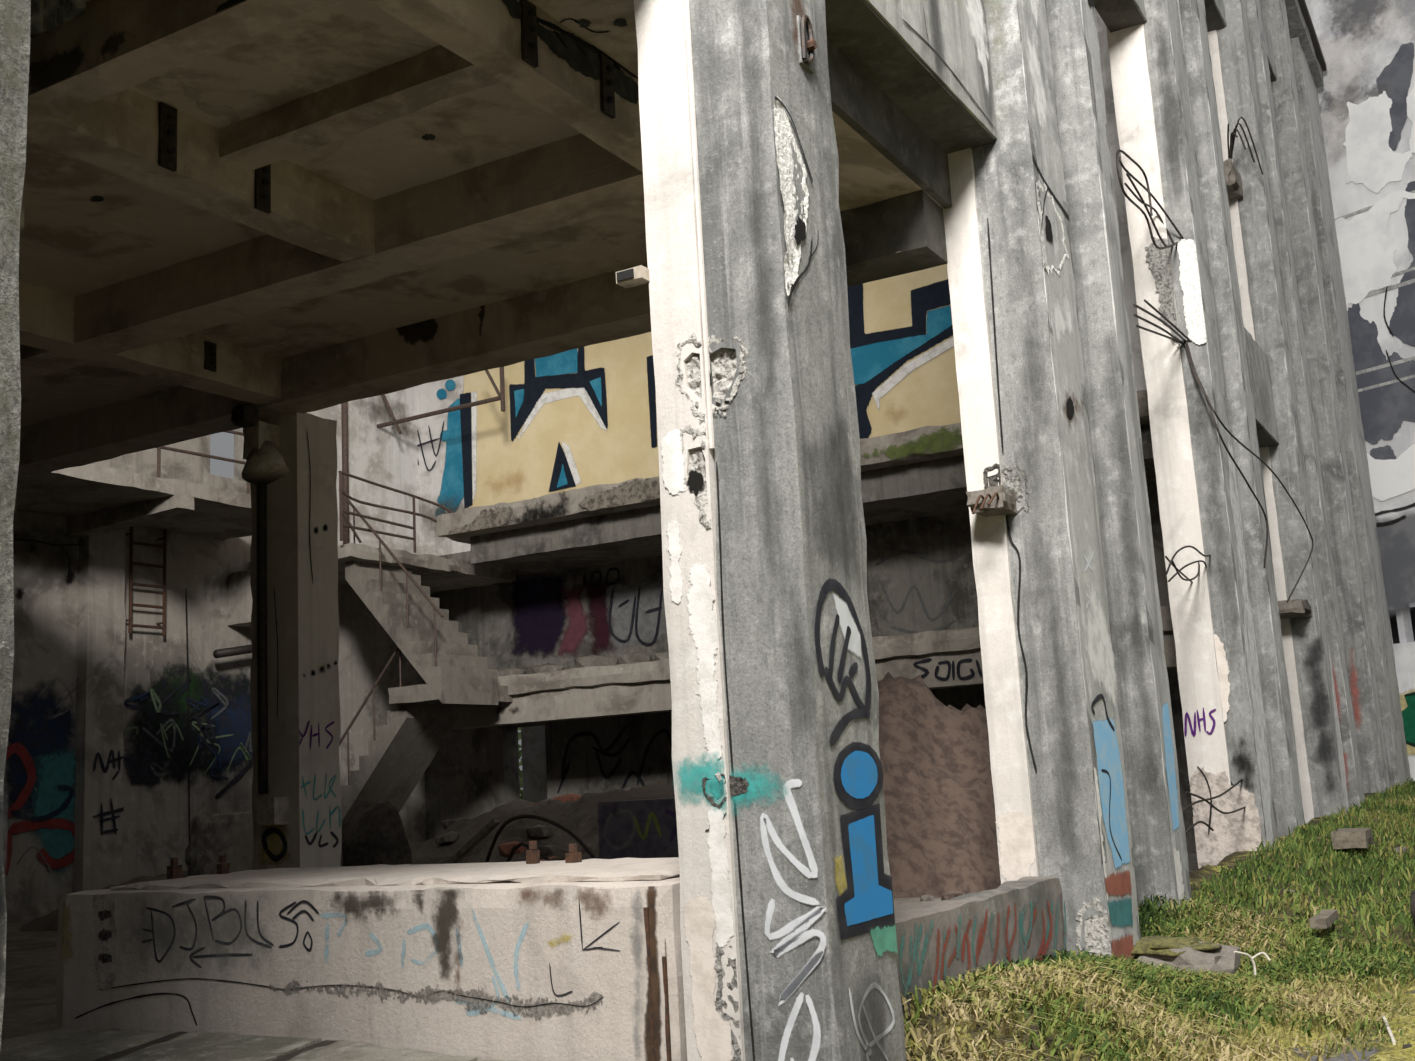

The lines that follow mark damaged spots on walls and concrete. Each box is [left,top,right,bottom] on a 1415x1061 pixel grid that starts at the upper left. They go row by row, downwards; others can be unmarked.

peeling [502,0,639,104]
spalling [579,332,748,529]
spalling [1116,149,1314,603]
spalling [448,507,511,535]
peeling [1214,634,1230,722]
damp [334,891,393,917]
damp [415,889,460,976]
rust [644,886,672,1061]
peeling [666,521,749,1061]
spalling [1173,766,1264,904]